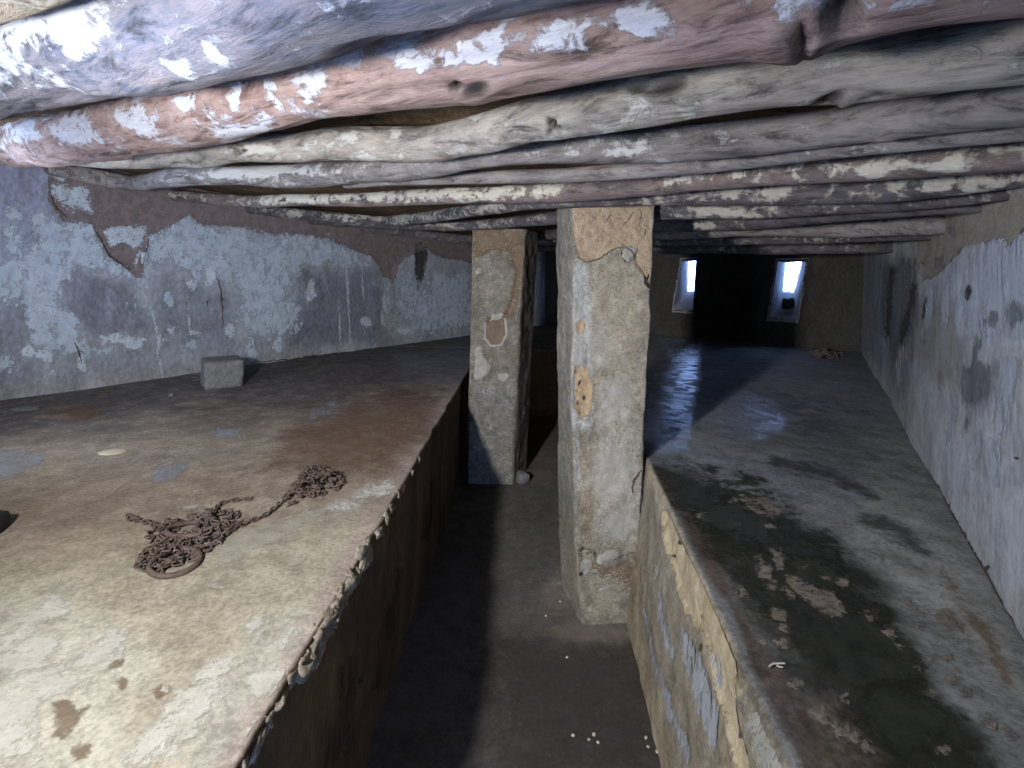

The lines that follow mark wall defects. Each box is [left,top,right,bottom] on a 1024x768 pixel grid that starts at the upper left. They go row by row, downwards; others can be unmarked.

spalling [90,167,137,176]
spalling [0,176,524,382]
spalling [572,365,593,419]
spalling [573,206,651,284]
damp [878,234,1024,487]
spalling [915,188,1024,281]
spalling [241,455,420,768]
spalling [651,510,749,768]
spalling [728,494,783,529]
damp [573,262,985,768]